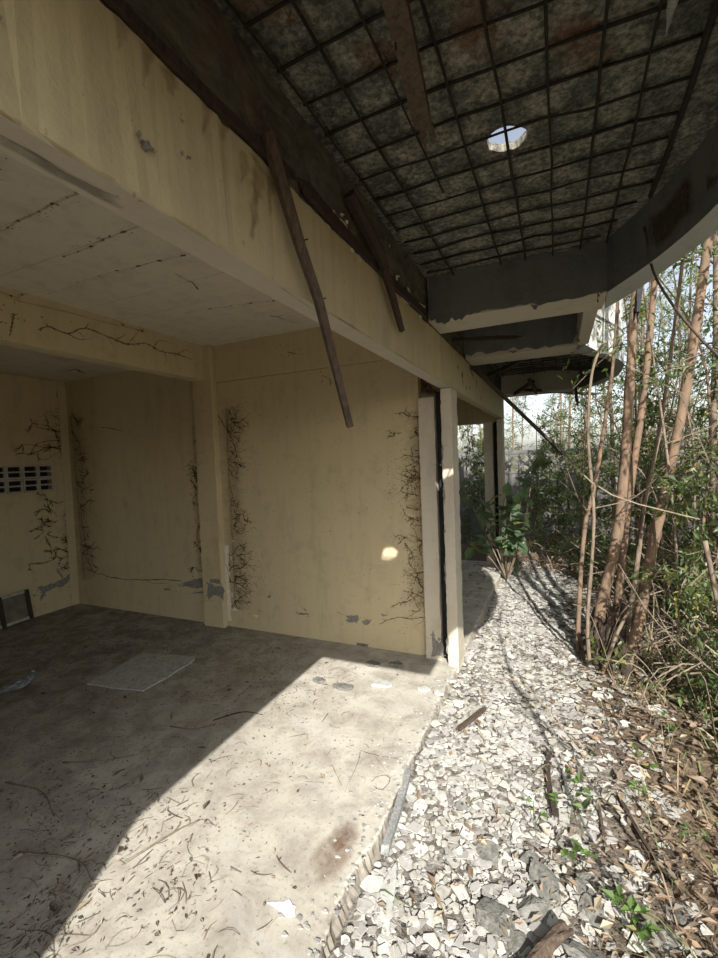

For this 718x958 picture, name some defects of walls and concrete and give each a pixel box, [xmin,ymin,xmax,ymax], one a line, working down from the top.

spalling [224,0,718,377]
peeling [164,540,241,621]
peeling [337,612,388,625]